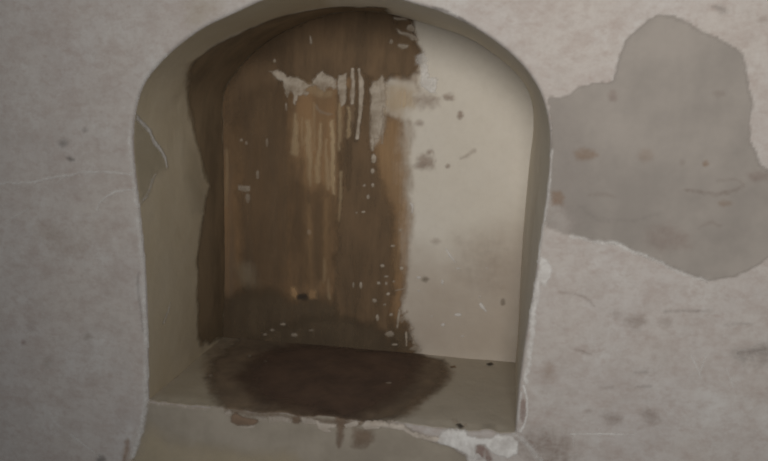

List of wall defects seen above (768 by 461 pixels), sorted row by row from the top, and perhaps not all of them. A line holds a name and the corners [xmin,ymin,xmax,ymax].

crack [136,115,168,167]
water stain [188,7,446,445]
spalling [131,241,551,461]
peeling [548,15,768,280]